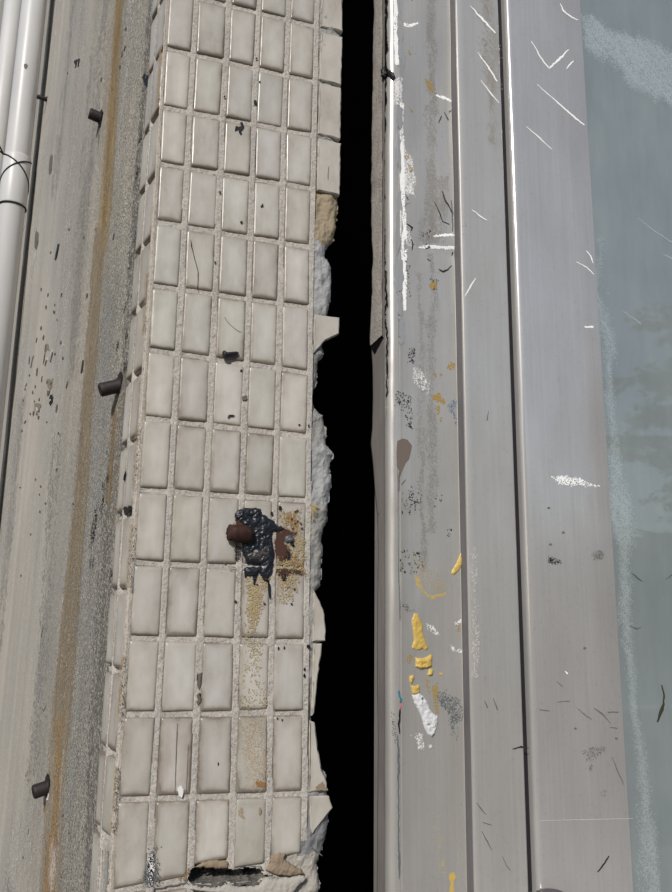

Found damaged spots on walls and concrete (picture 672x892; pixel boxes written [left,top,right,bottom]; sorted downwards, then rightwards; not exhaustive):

spalling [21,326,64,432]
corrosion [38,0,127,892]
corrosion [234,503,319,791]